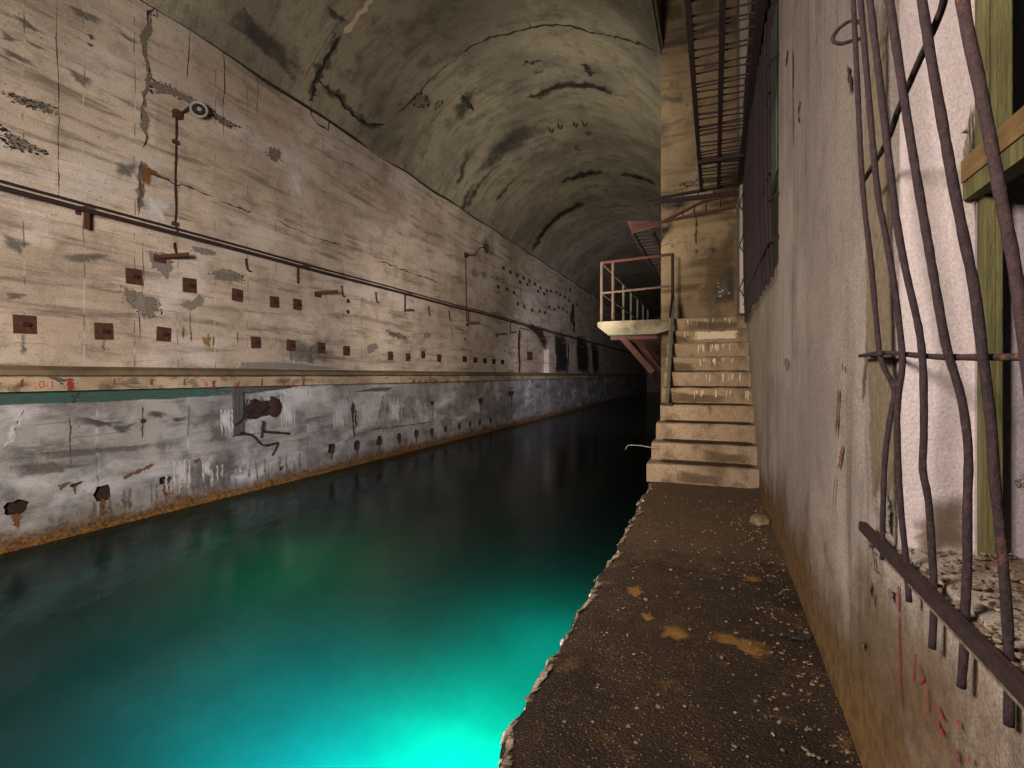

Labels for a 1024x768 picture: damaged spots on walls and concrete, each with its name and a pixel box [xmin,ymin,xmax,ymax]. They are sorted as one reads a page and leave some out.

spalling [2,91,58,115]
spalling [0,124,49,155]
crack [136,0,716,317]
rust [139,162,165,195]
spalling [146,251,174,279]